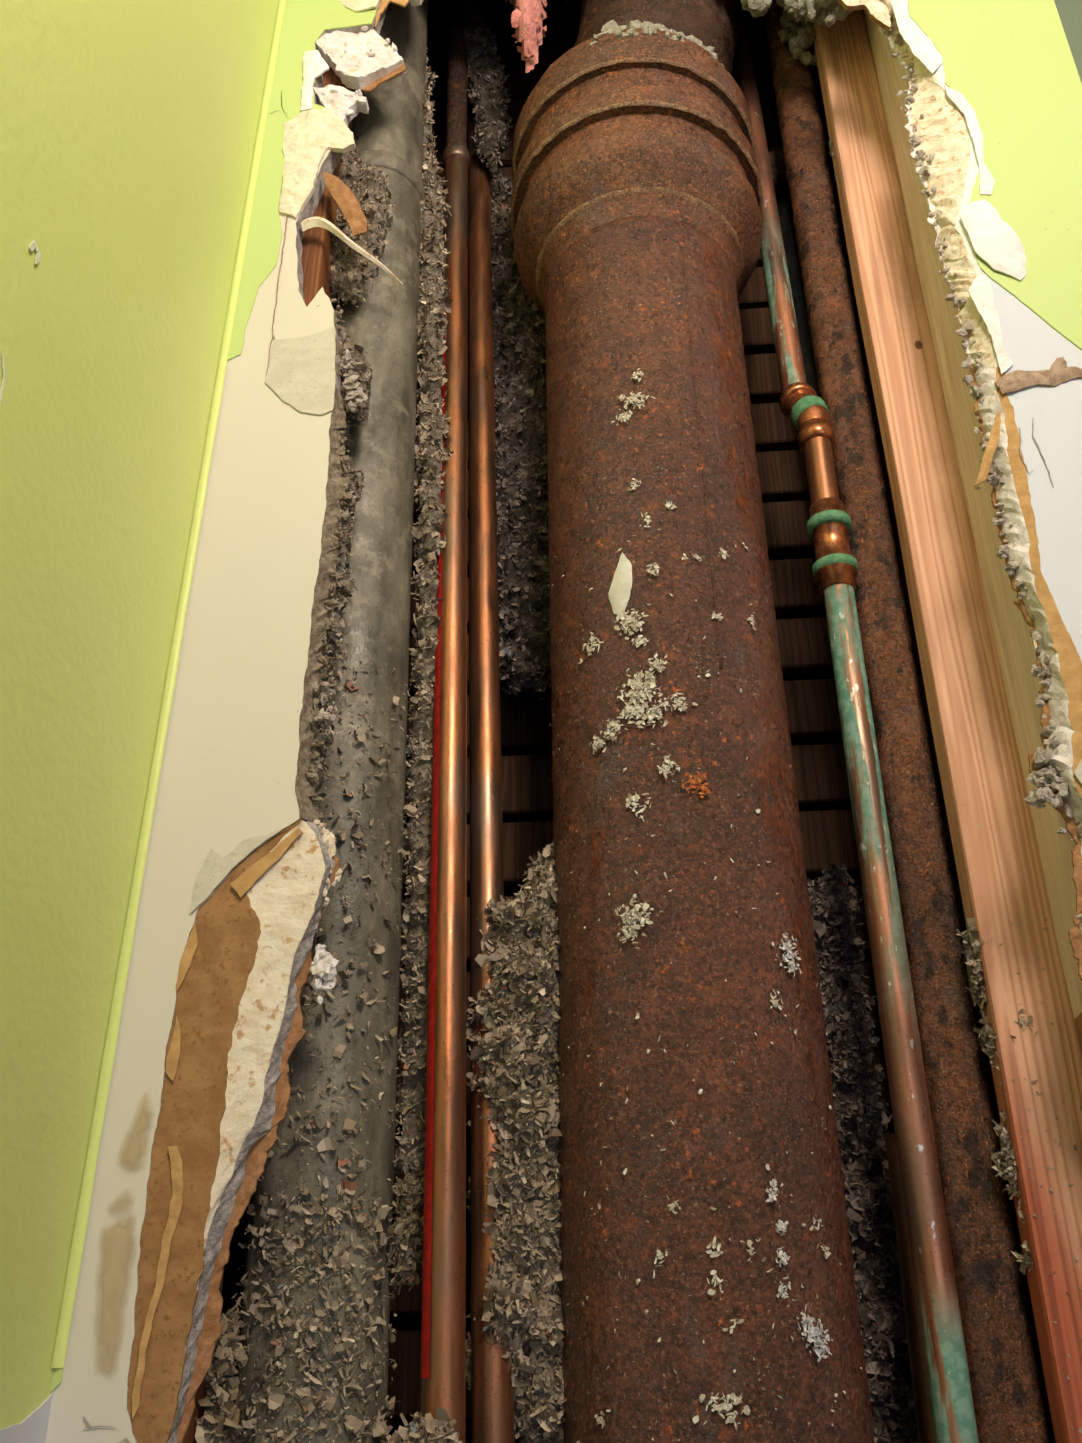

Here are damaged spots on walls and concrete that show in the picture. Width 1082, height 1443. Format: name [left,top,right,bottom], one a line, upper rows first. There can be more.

spalling [487,0,583,179]
spalling [809,44,828,133]
spalling [832,0,1082,981]
peeling [0,0,449,1443]
spalling [500,678,554,902]
spalling [738,251,895,1180]
spalling [976,1003,1001,1125]
spalling [1005,1174,1023,1255]
spalling [1023,1272,1056,1443]